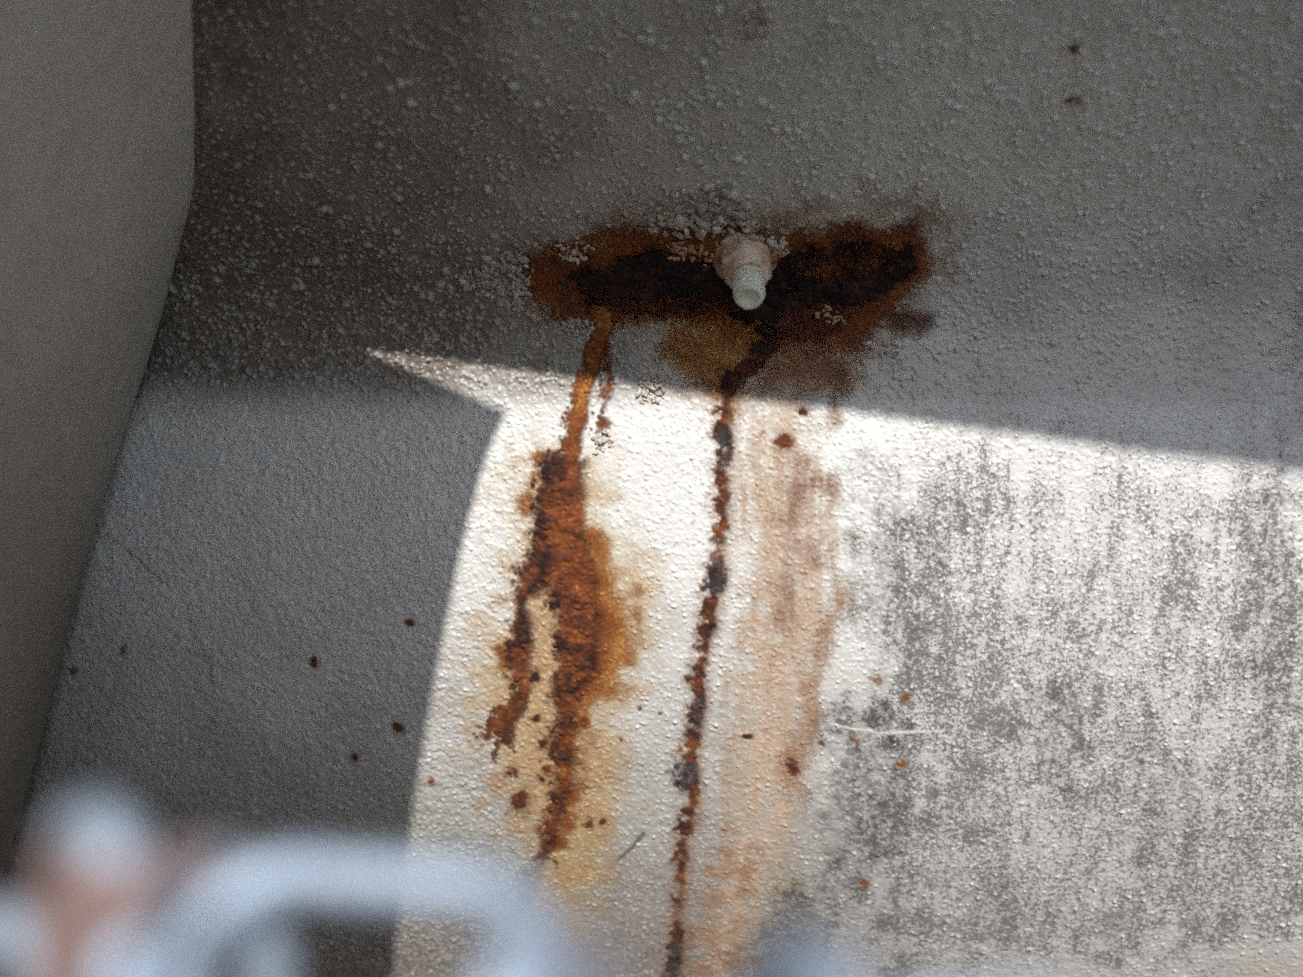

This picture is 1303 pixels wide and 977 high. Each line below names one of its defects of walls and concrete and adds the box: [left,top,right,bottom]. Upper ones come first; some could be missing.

corrosion [473,222,931,977]